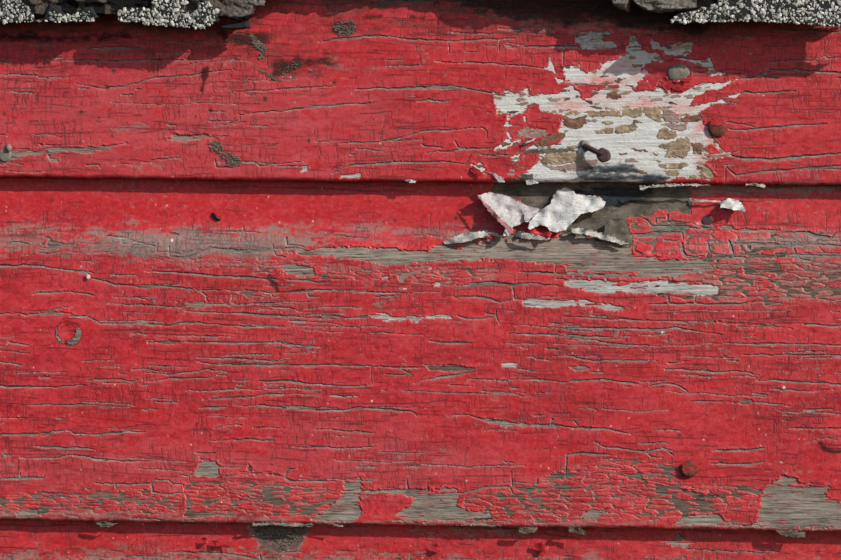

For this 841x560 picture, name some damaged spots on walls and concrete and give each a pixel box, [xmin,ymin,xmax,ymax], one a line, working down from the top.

crack [238,85,492,115]
crack [325,35,602,85]
crack [738,69,841,96]
crack [727,121,827,131]
crack [214,159,299,169]
crack [334,128,488,173]
peeling [135,23,841,315]
crack [725,153,841,182]
crack [630,214,841,264]
crack [0,227,841,498]
peeling [0,456,841,552]
crack [172,551,262,560]